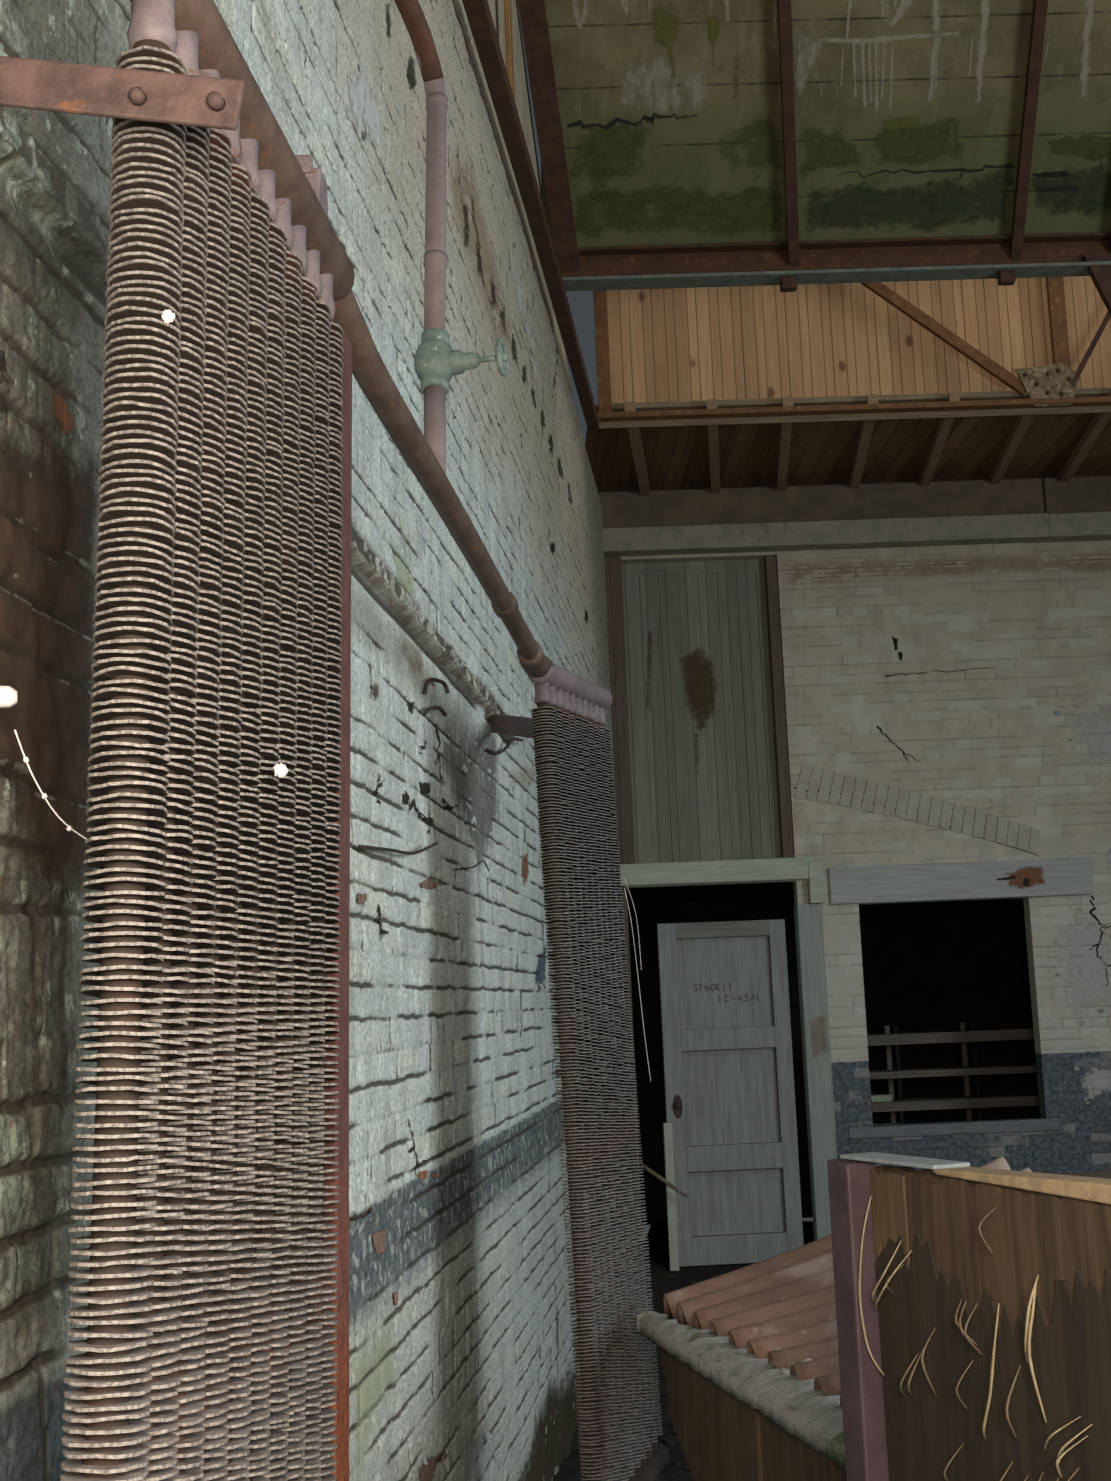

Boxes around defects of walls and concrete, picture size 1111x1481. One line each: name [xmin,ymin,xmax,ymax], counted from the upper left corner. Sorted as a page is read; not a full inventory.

damp [815,0,990,110]
damp [1079,0,1095,98]
crack [567,113,697,131]
crack [838,163,1013,179]
damp [683,650,716,763]
rust [996,866,1045,889]
crack [1088,895,1111,987]
peeling [1074,1065,1111,1104]